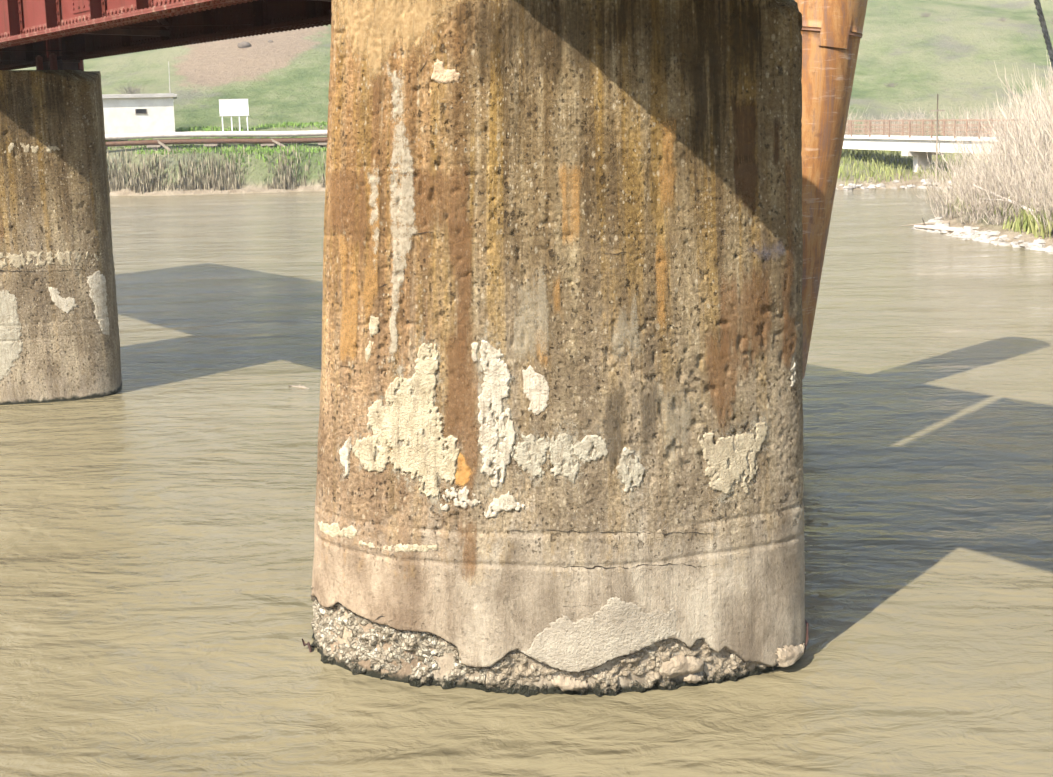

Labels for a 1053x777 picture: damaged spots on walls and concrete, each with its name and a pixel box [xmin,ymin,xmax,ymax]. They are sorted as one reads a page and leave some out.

damp [467,0,761,151]
rust [560,167,579,240]
rust [660,120,676,207]
peeling [0,290,23,380]
peeling [0,250,110,335]
peeling [365,315,398,362]
rust [537,328,547,363]
rust [656,245,667,323]
peeling [337,329,645,518]
peeling [698,417,768,502]
crack [560,562,720,570]
spalling [310,586,779,697]